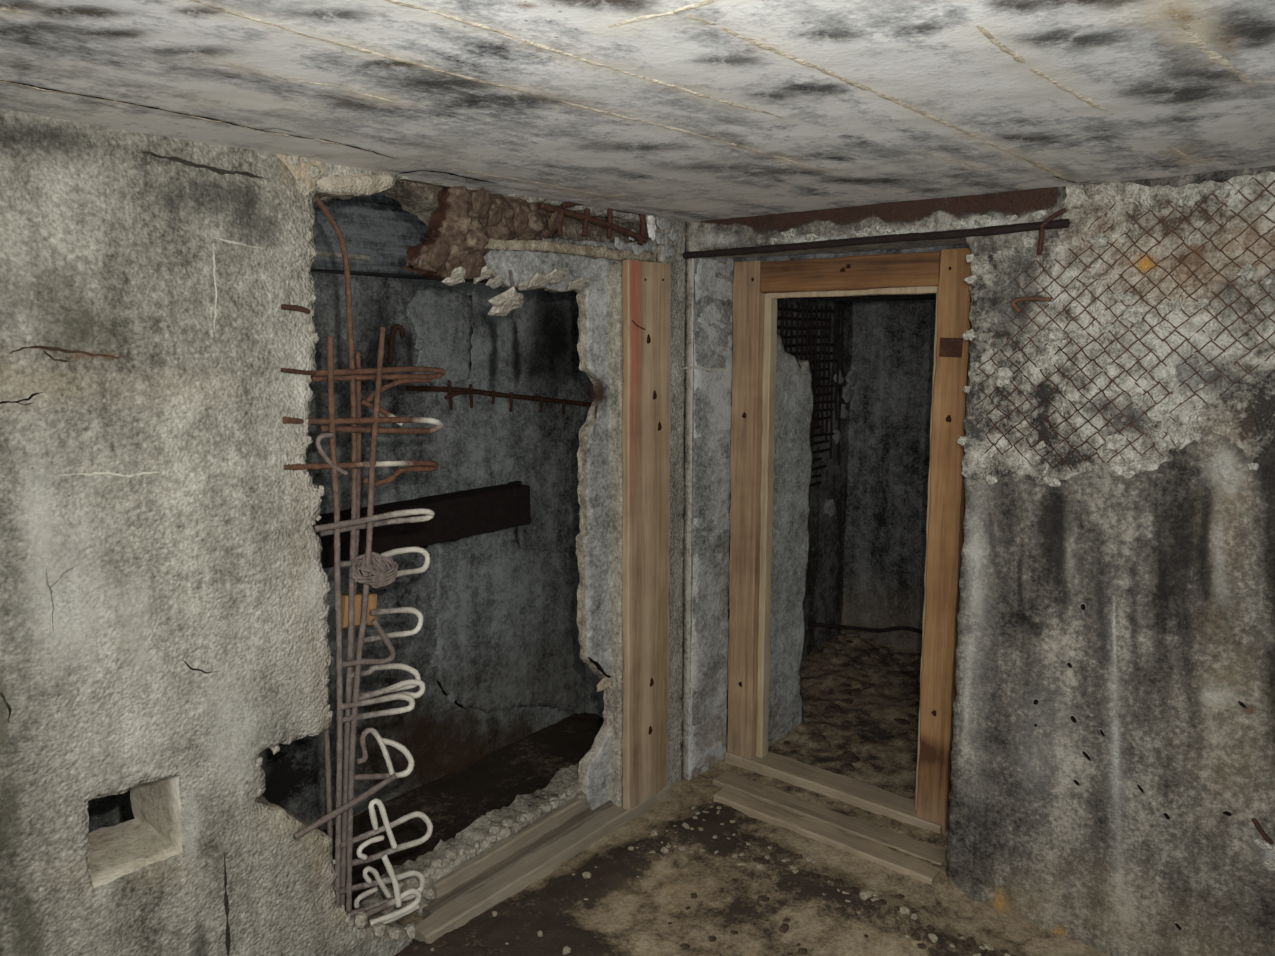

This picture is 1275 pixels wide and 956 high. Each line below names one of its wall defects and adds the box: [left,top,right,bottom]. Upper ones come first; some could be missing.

leakage [0,2,138,37]
leakage [995,0,1132,11]
leakage [1029,31,1116,47]
leakage [755,85,845,99]
leakage [1131,70,1227,103]
crack [0,80,493,183]
spalling [539,202,678,257]
spalling [957,171,1275,487]
crack [9,346,118,362]
crack [0,392,43,405]
peeling [276,154,592,940]
spalling [256,745,280,767]